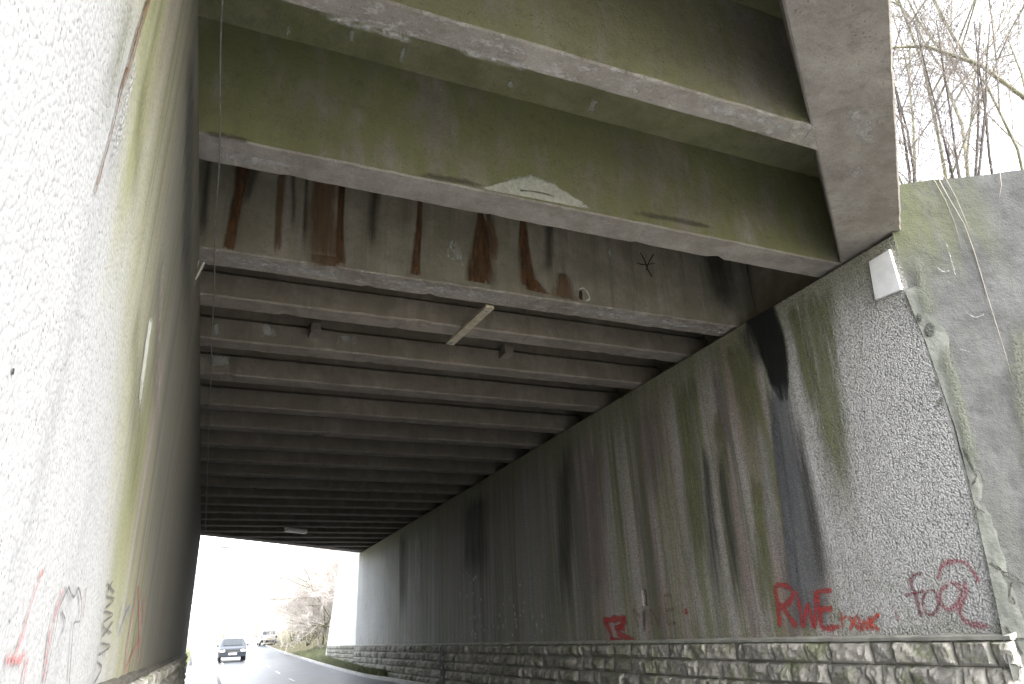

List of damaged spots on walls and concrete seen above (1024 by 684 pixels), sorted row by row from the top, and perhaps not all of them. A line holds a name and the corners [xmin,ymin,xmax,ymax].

rust [224,166,257,249]
rust [275,175,285,248]
rust [304,179,345,267]
rust [412,201,422,275]
rust [468,213,497,284]
rust [519,221,572,299]
water stain [742,306,825,627]